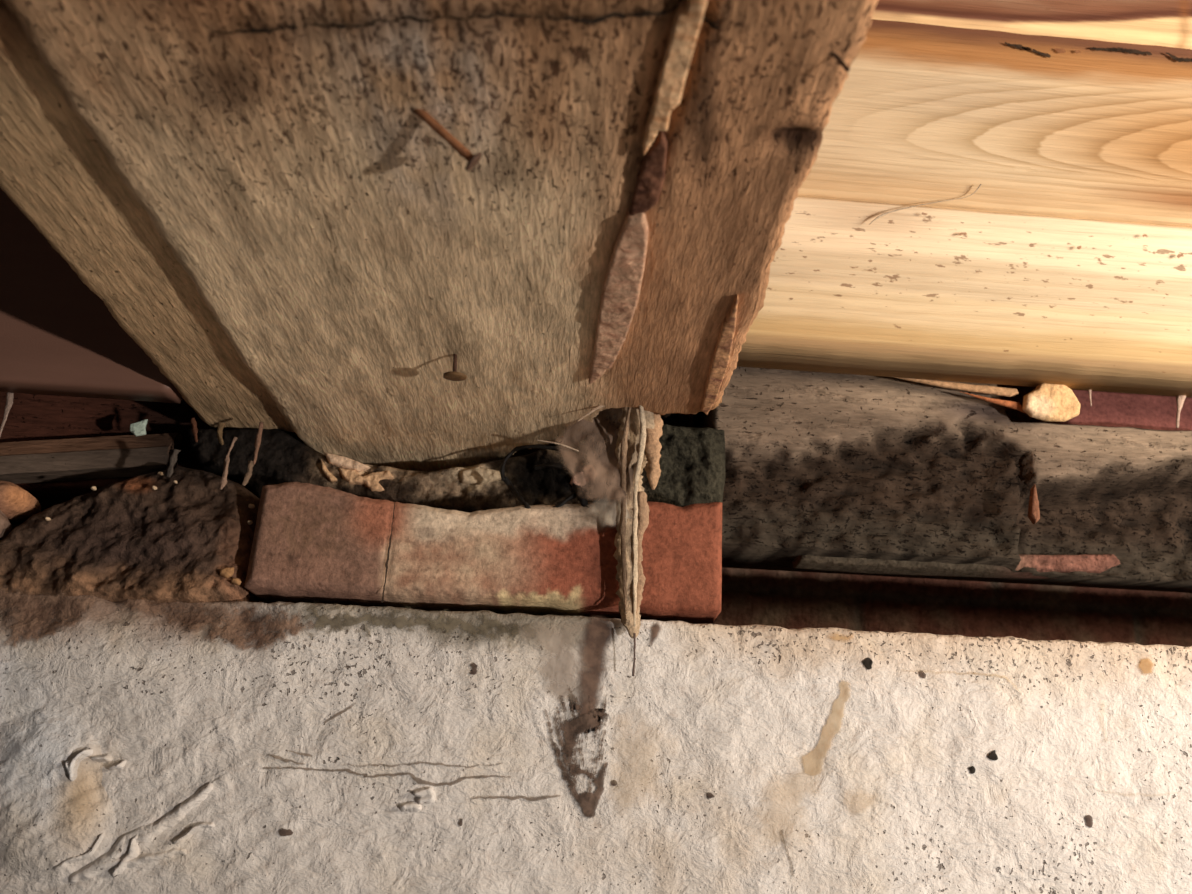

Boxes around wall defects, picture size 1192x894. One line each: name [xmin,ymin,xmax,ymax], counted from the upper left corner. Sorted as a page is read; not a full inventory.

crack [324,703,355,723]
damp [803,681,850,775]
crack [263,751,561,801]